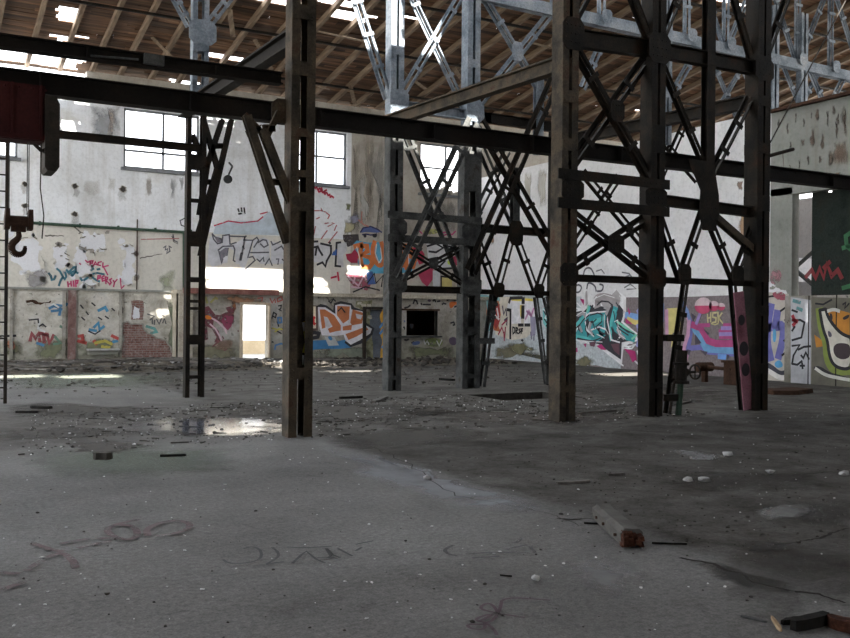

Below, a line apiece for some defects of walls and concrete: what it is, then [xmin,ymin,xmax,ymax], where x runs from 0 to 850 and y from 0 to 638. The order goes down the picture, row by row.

peeling [8,230,110,289]
peeling [117,238,140,286]
spalling [118,300,172,358]
crack [680,557,846,603]